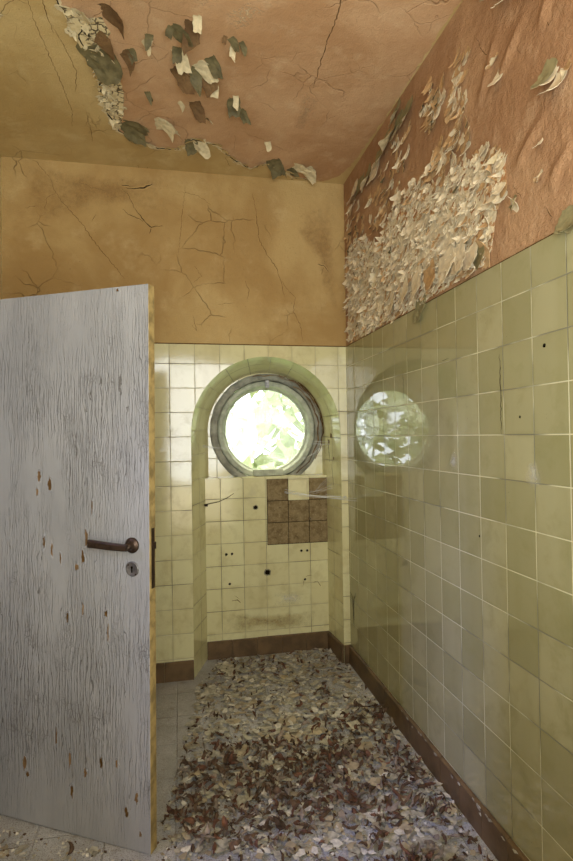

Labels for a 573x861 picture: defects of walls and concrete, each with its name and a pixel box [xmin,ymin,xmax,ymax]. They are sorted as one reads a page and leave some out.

crack [0,0,93,141]
crack [313,0,341,88]
peeling [531,58,571,95]
peeling [54,0,519,343]
crack [81,183,206,252]
peeling [266,477,328,545]